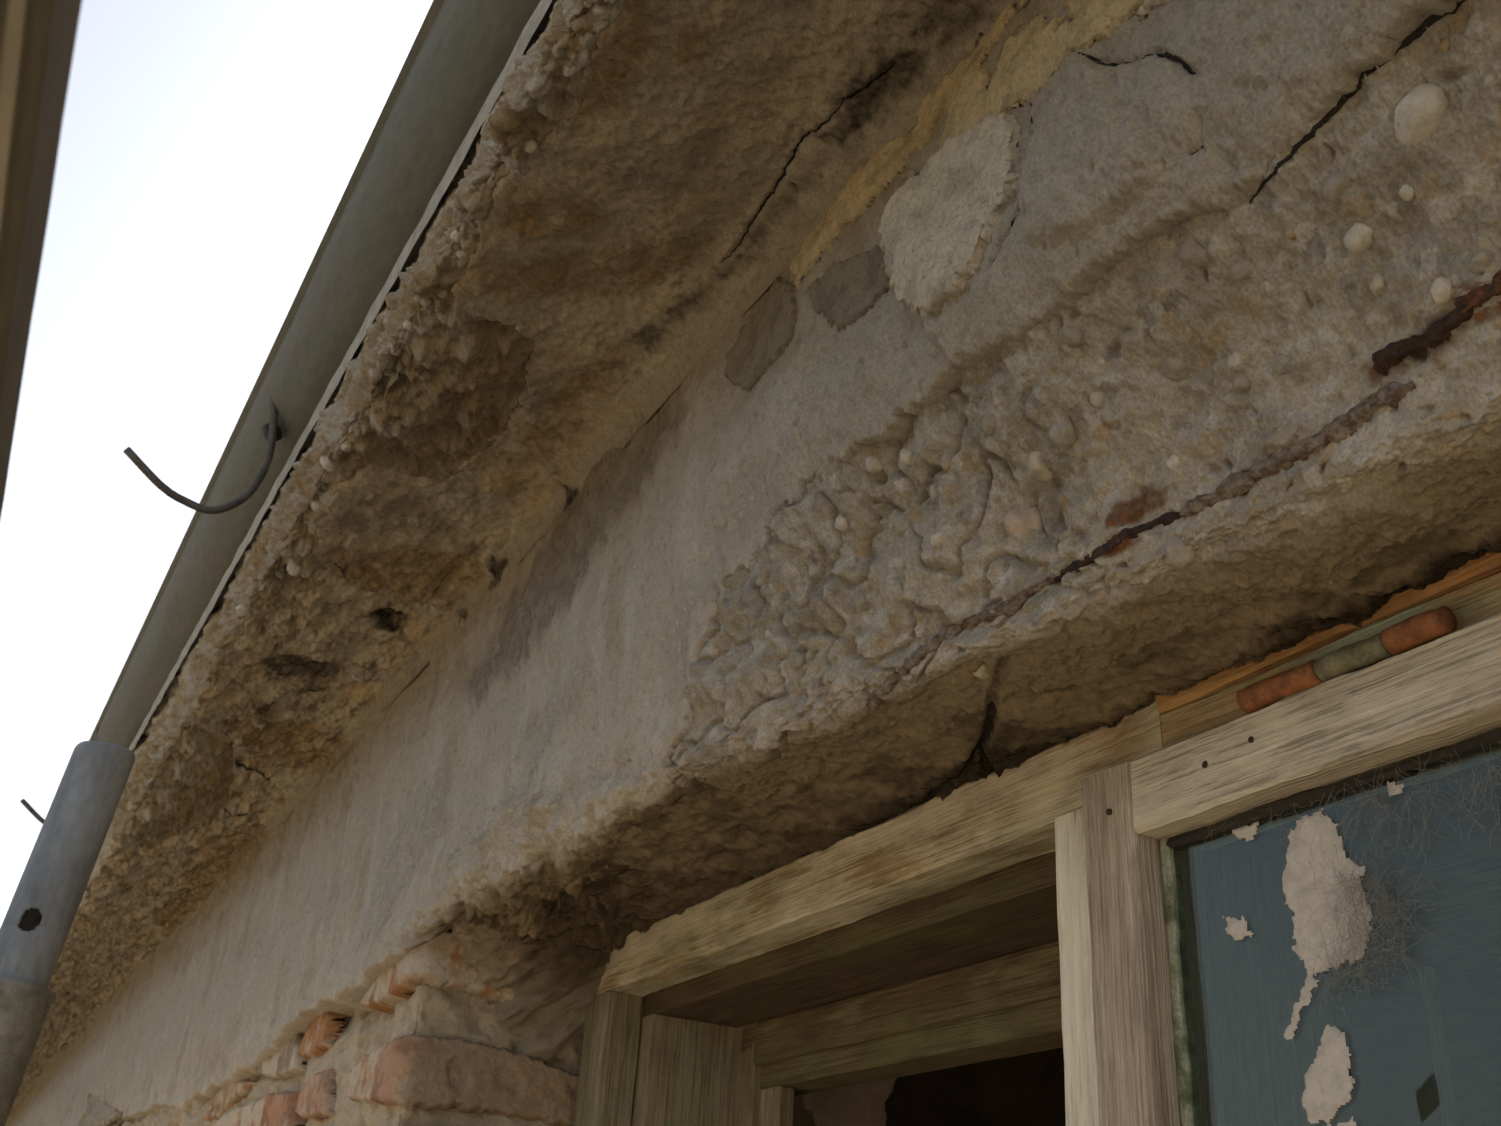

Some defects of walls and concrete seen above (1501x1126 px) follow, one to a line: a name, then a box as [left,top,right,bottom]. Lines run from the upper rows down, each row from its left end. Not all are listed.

crack [723,62,895,261]
crack [1249,0,1466,204]
spalling [111,0,624,846]
spalling [671,0,1501,801]
corrosion [860,271,1501,716]
crack [970,701,997,773]